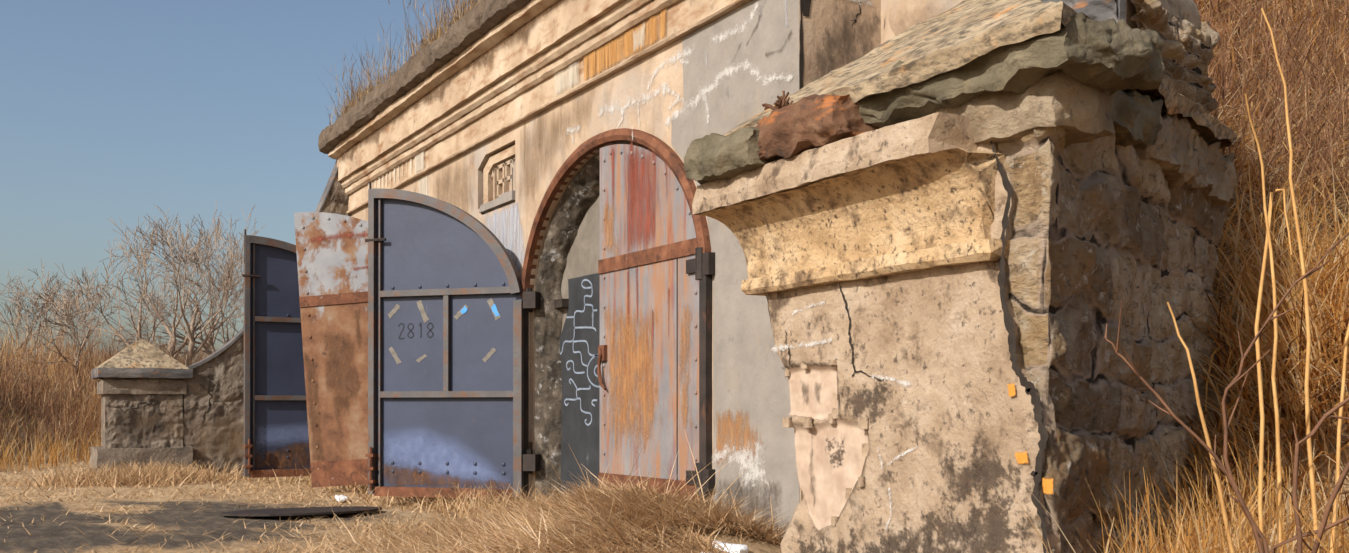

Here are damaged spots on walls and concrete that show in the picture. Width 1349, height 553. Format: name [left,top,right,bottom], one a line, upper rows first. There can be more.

crack [797,0,805,89]
corrosion [311,233,366,242]
corrosion [604,143,667,248]
corrosion [256,313,359,469]
crack [839,282,884,381]
leakage [841,375,910,423]
crack [990,141,1049,553]
leakage [712,412,777,530]
leakage [792,445,1033,553]